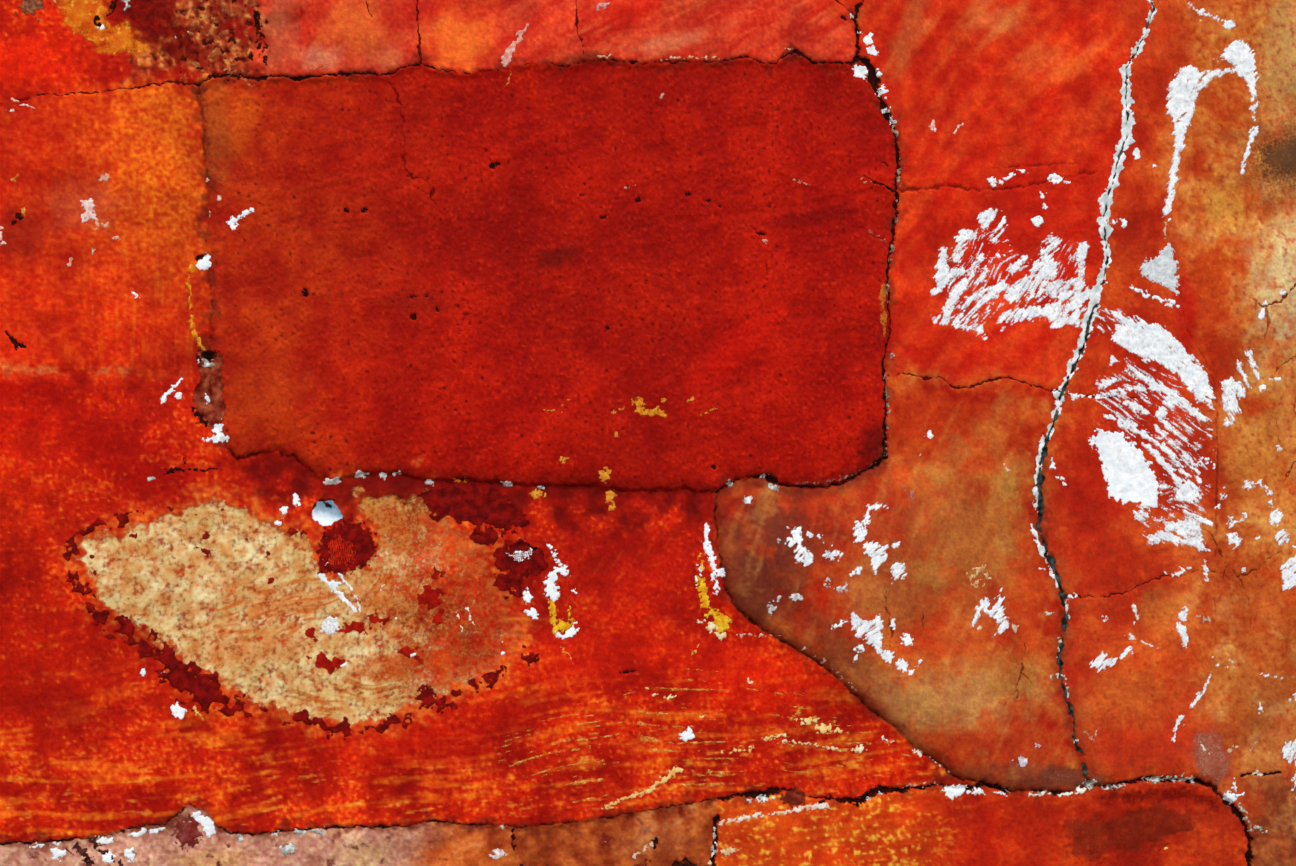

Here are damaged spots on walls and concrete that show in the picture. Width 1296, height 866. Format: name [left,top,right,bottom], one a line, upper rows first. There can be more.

crack [1,0,489,122]
peeling [977,208,1008,243]
peeling [1094,308,1216,415]
crack [525,0,1282,866]
crack [229,450,647,511]
peeling [806,531,843,561]
peeling [853,502,888,543]
peeling [891,541,907,580]
peeling [63,478,558,741]
peeling [881,619,923,676]
peeling [567,687,871,810]
crack [0,805,577,866]